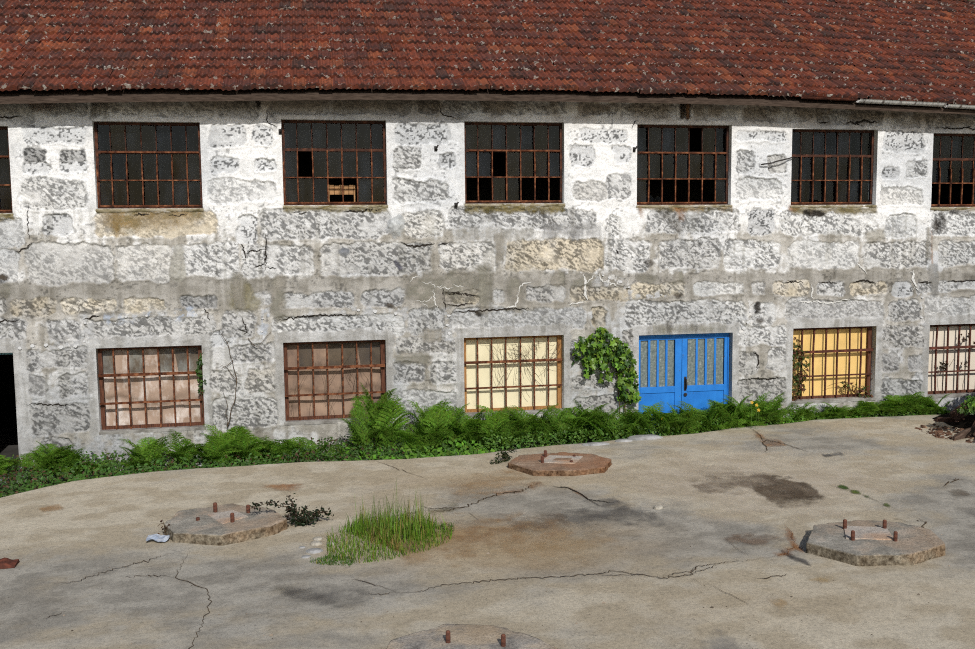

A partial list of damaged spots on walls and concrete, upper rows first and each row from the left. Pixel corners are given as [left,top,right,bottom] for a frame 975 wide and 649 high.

crack [424,482,609,518]
water stain [694,474,823,504]
crack [42,551,212,649]
crack [353,530,797,603]